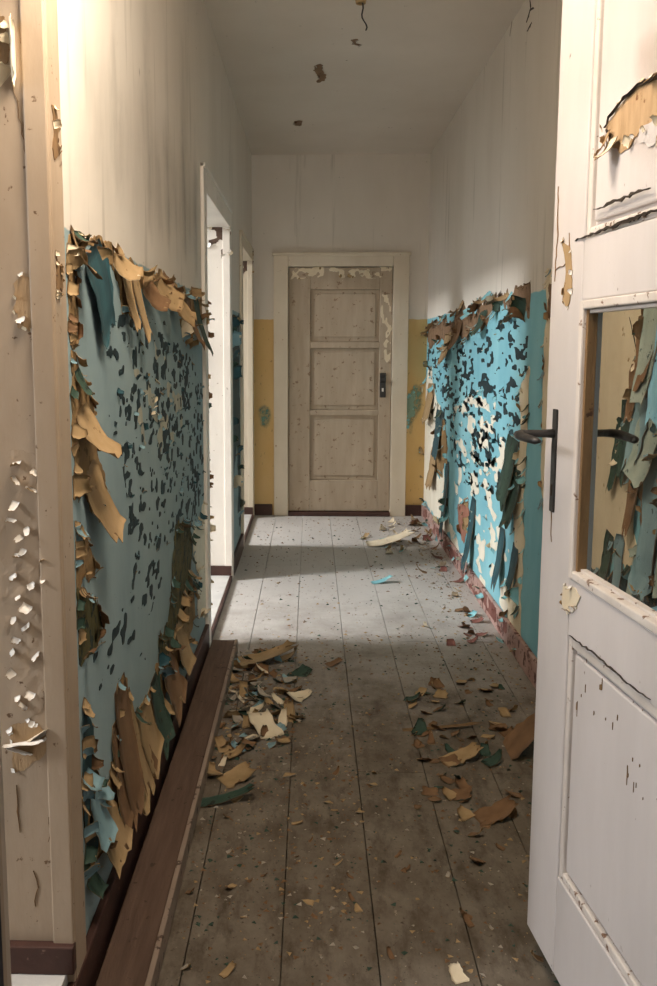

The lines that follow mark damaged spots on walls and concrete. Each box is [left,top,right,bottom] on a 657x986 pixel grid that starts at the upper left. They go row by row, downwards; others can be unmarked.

peeling [0,13,16,87]
peeling [593,72,657,161]
peeling [291,265,392,281]
peeling [380,294,392,362]
peeling [407,238,573,652]
peeling [591,309,657,611]
peeling [55,225,216,899]
peeling [360,517,405,554]
crack [569,635,651,700]